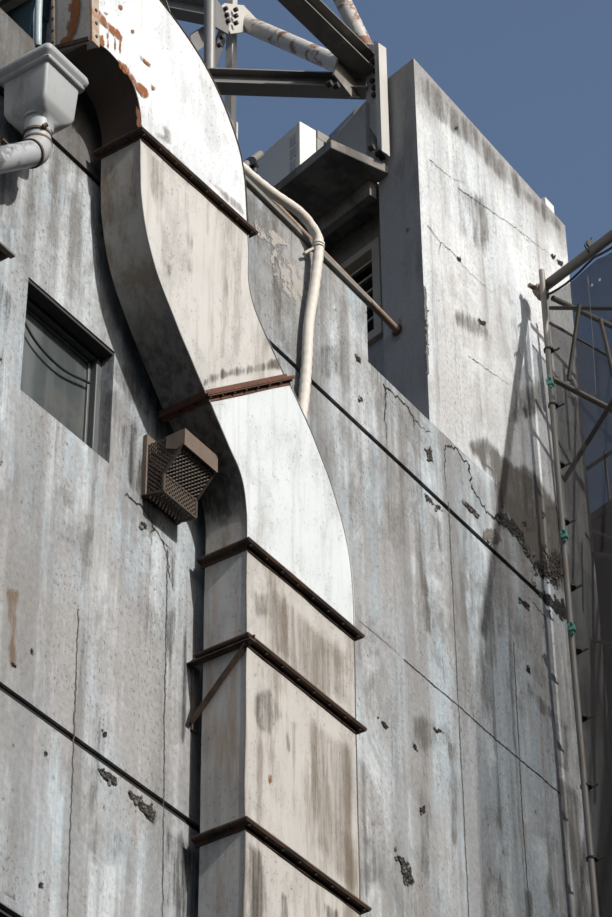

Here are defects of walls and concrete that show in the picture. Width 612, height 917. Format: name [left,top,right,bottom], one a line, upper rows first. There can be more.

rust [60,0,80,44]
rust [99,11,155,98]
damp [428,82,477,138]
crack [383,383,428,438]
damp [129,426,143,492]
spalling [483,512,567,622]
rust [7,589,18,662]
crack [126,493,173,916]
crack [360,445,561,915]
spalling [98,768,118,786]
spalling [129,790,156,822]
damp [561,783,592,917]